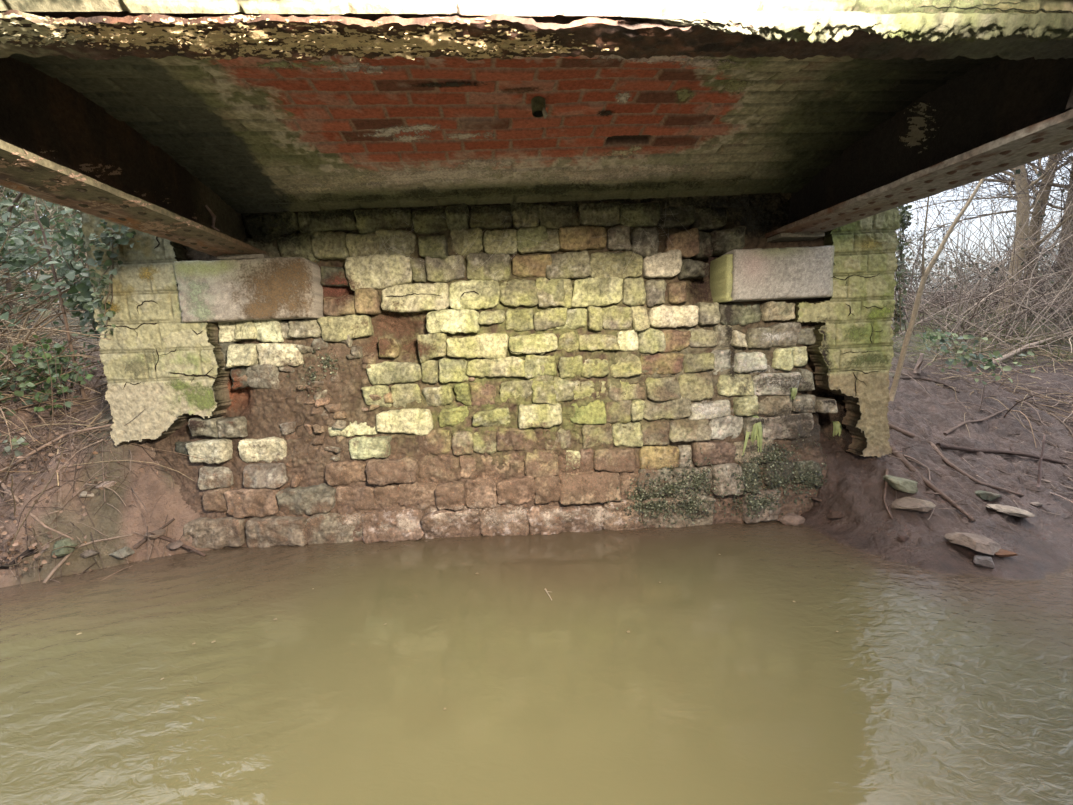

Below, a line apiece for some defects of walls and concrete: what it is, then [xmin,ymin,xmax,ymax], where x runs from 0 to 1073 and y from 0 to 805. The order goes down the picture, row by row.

peeling [0,13,619,61]
spalling [255,302,435,466]
spalling [819,392,852,453]